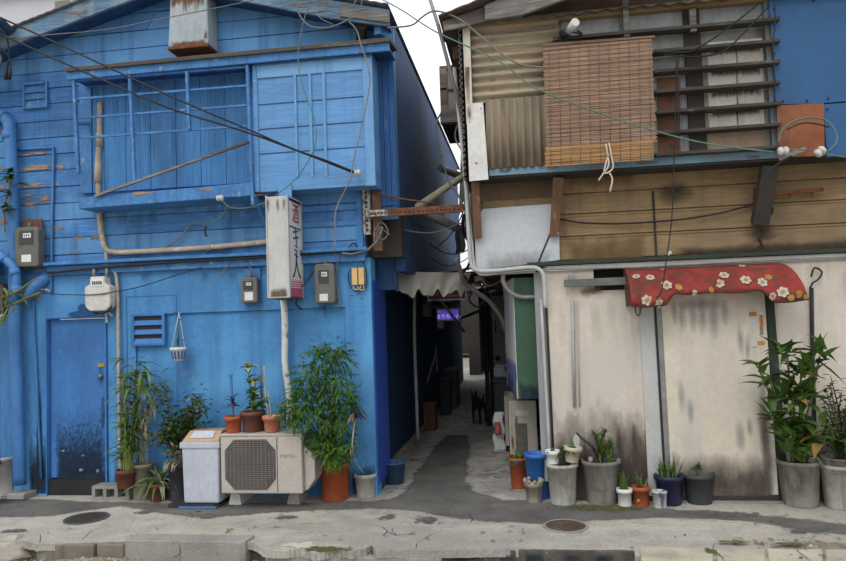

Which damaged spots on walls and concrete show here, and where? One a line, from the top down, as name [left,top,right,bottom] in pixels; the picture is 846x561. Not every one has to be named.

peeling [22,152,64,172]
peeling [20,183,50,207]
leakage [58,434,103,479]
leakage [561,427,648,501]